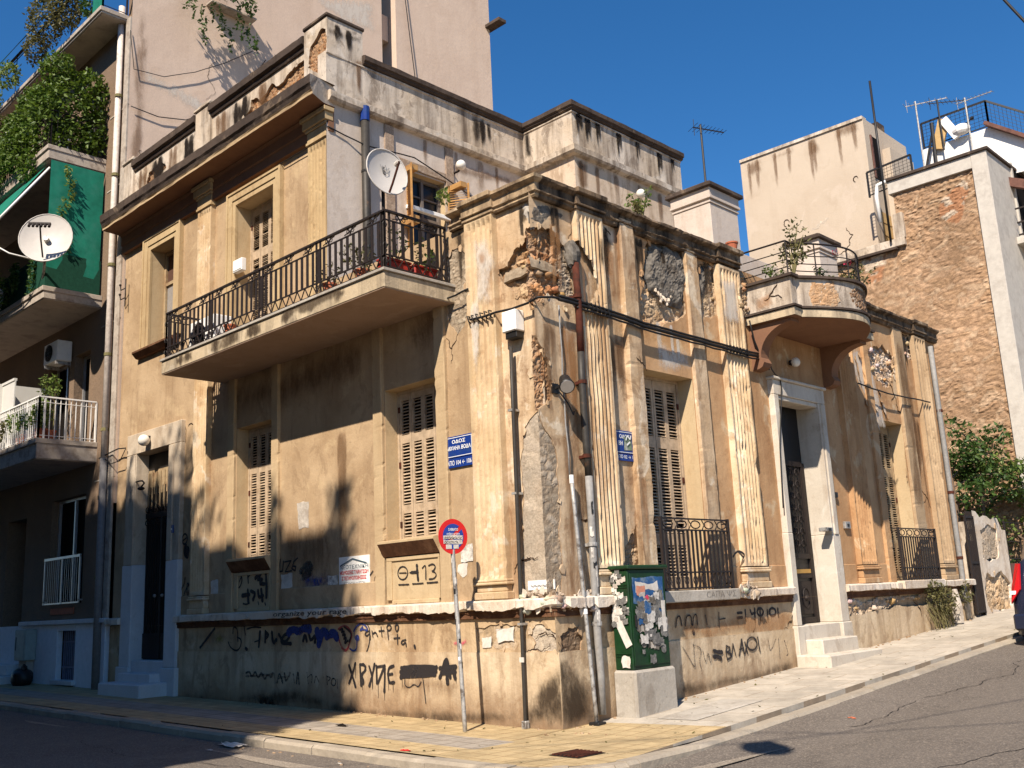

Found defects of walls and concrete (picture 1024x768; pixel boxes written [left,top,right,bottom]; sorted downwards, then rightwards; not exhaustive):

spalling [242,29,327,119]
leakage [576,112,601,142]
spalling [498,223,573,312]
spalling [639,240,683,326]
spalling [853,334,911,430]
spalling [477,334,596,652]
spalling [980,523,1011,612]